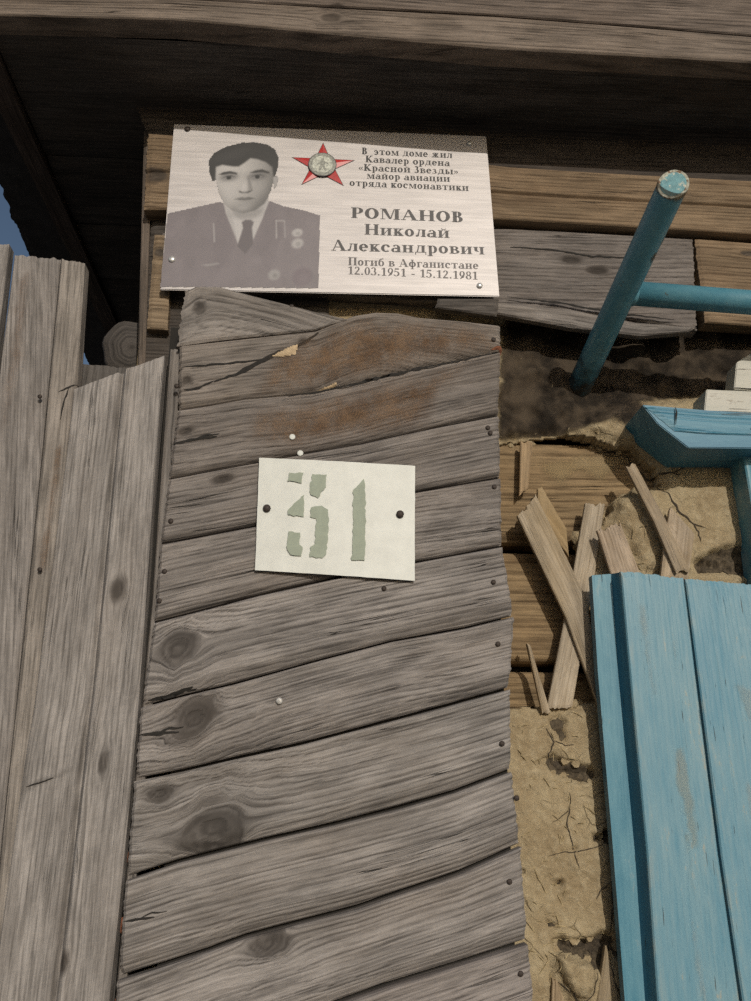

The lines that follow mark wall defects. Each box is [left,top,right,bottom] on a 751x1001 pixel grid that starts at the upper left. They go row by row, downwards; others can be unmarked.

crack [181,332,319,390]
leakage [498,317,751,438]
spalling [548,441,625,478]
crack [597,451,706,540]
spalling [694,546,744,576]
crack [548,796,604,867]
crack [596,880,614,934]
crack [558,967,621,1001]